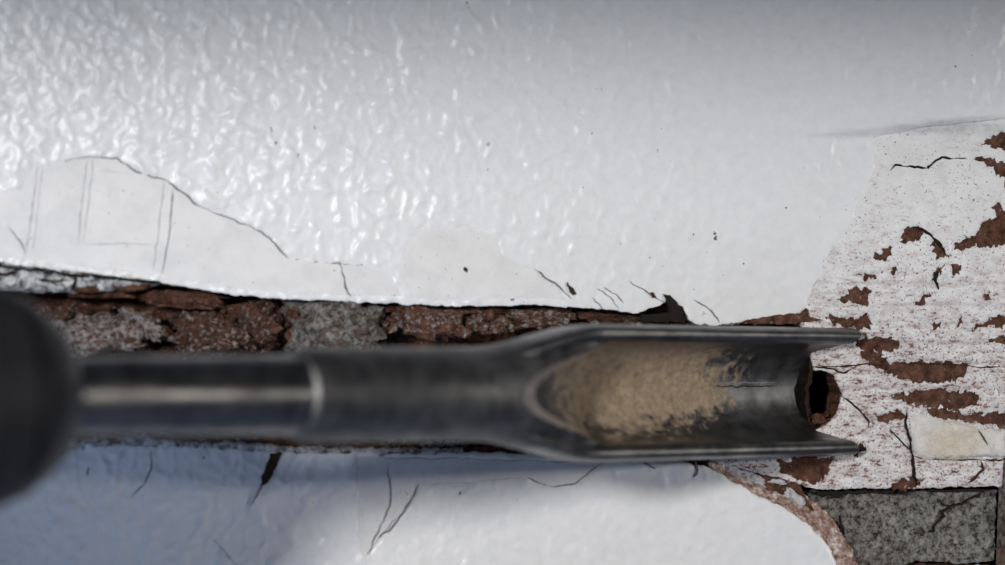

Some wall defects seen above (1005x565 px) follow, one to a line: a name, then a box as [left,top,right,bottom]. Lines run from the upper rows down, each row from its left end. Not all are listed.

crack [892,156,967,169]
peeling [974,132,1005,187]
peeling [873,226,924,276]
peeling [915,202,1005,306]
spalling [638,292,685,323]
peeling [729,273,1005,429]
spalling [706,456,858,565]
peeling [888,476,920,494]